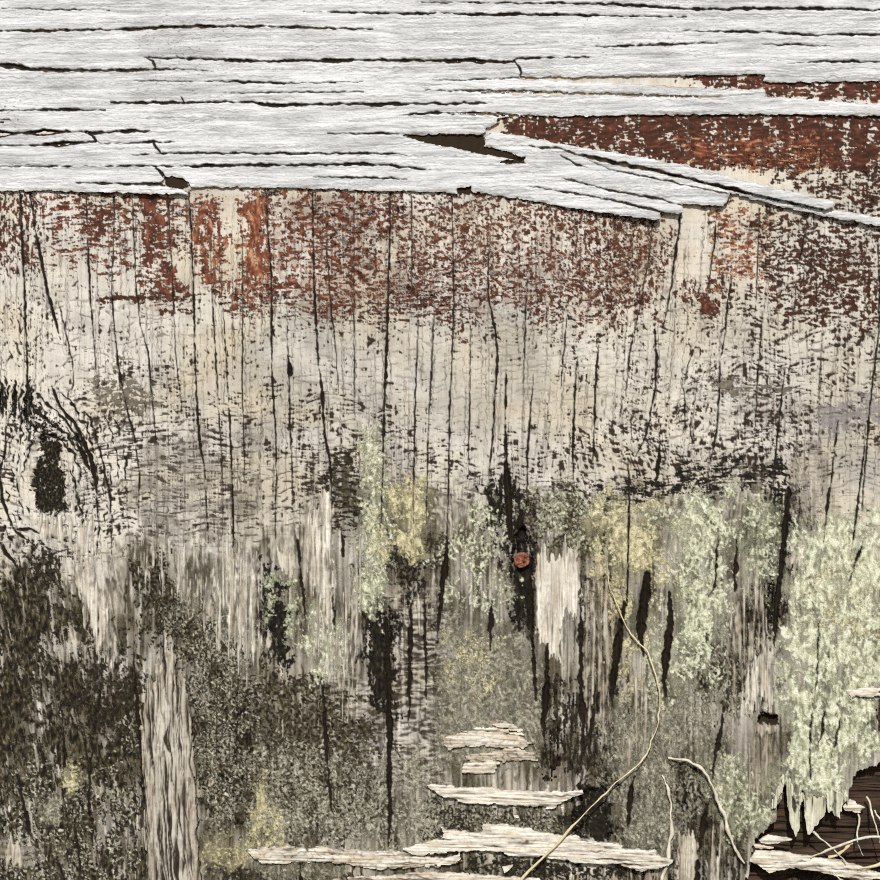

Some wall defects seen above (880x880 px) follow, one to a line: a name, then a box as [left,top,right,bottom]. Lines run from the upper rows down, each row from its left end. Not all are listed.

spalling [164,176,190,190]
spalling [403,134,526,164]
crack [0,1,880,652]
water stain [313,438,381,544]
crack [384,196,534,847]
crack [527,122,823,779]
water stain [0,528,451,880]
peeling [442,720,538,774]
water stain [419,443,820,880]
peeling [245,783,725,880]
peeling [749,834,880,880]
peeling [842,799,865,813]